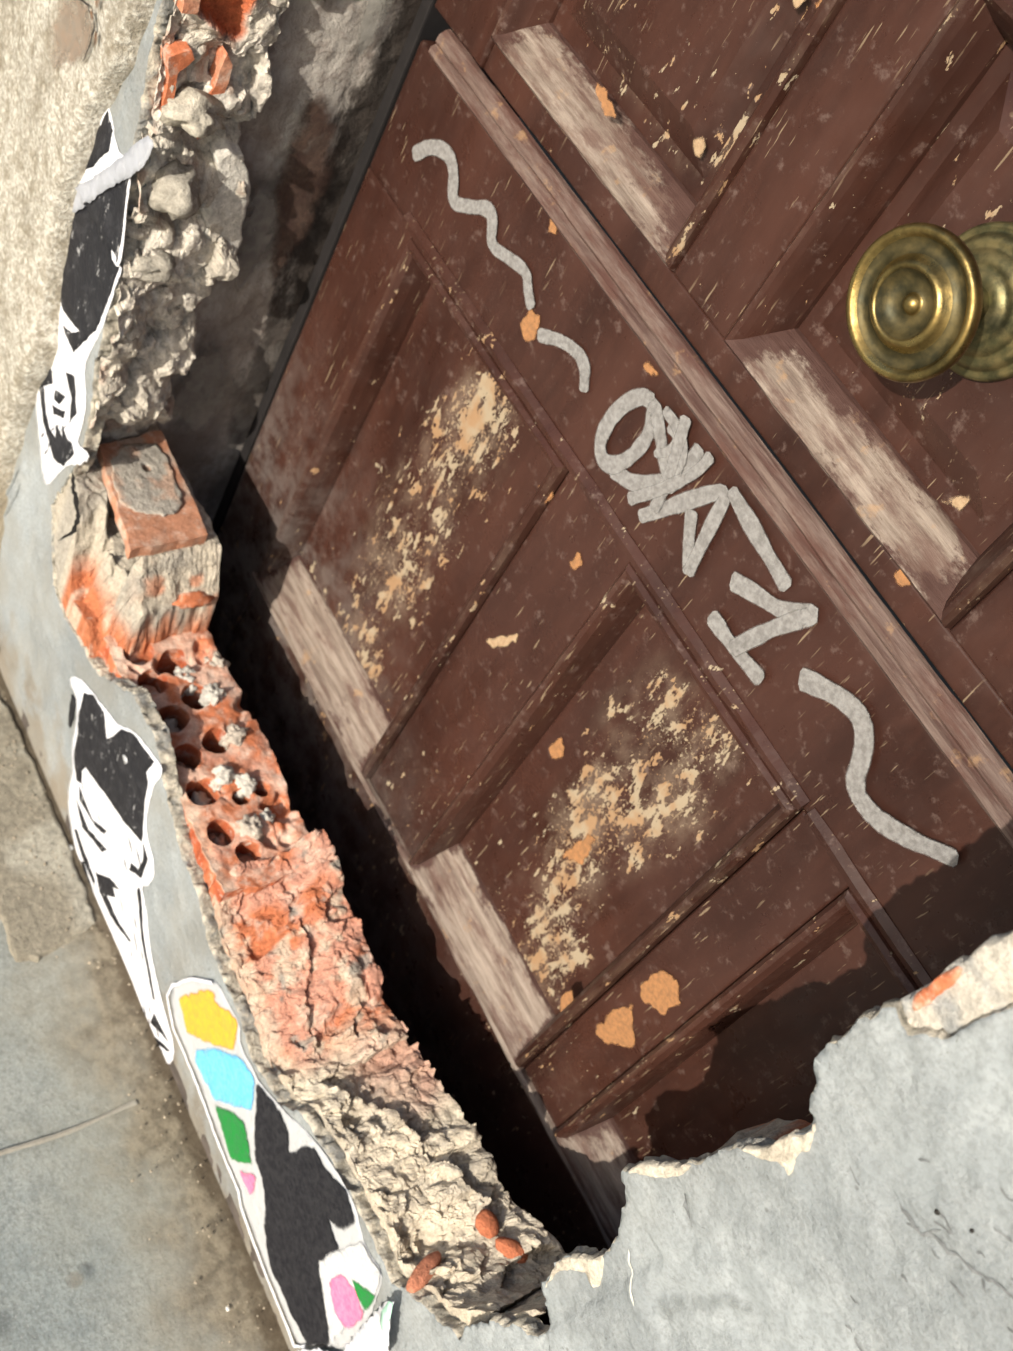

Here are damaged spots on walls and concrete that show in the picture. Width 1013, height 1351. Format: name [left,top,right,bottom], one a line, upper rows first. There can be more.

peeling [595,83,616,117]
peeling [693,138,705,157]
peeling [643,363,658,375]
peeling [951,496,969,510]
peeling [894,570,910,586]
spalling [53,0,604,1325]
spalling [900,931,1013,1036]
peeling [596,971,681,1048]
spalling [742,1124,815,1175]
spalling [628,1160,691,1178]